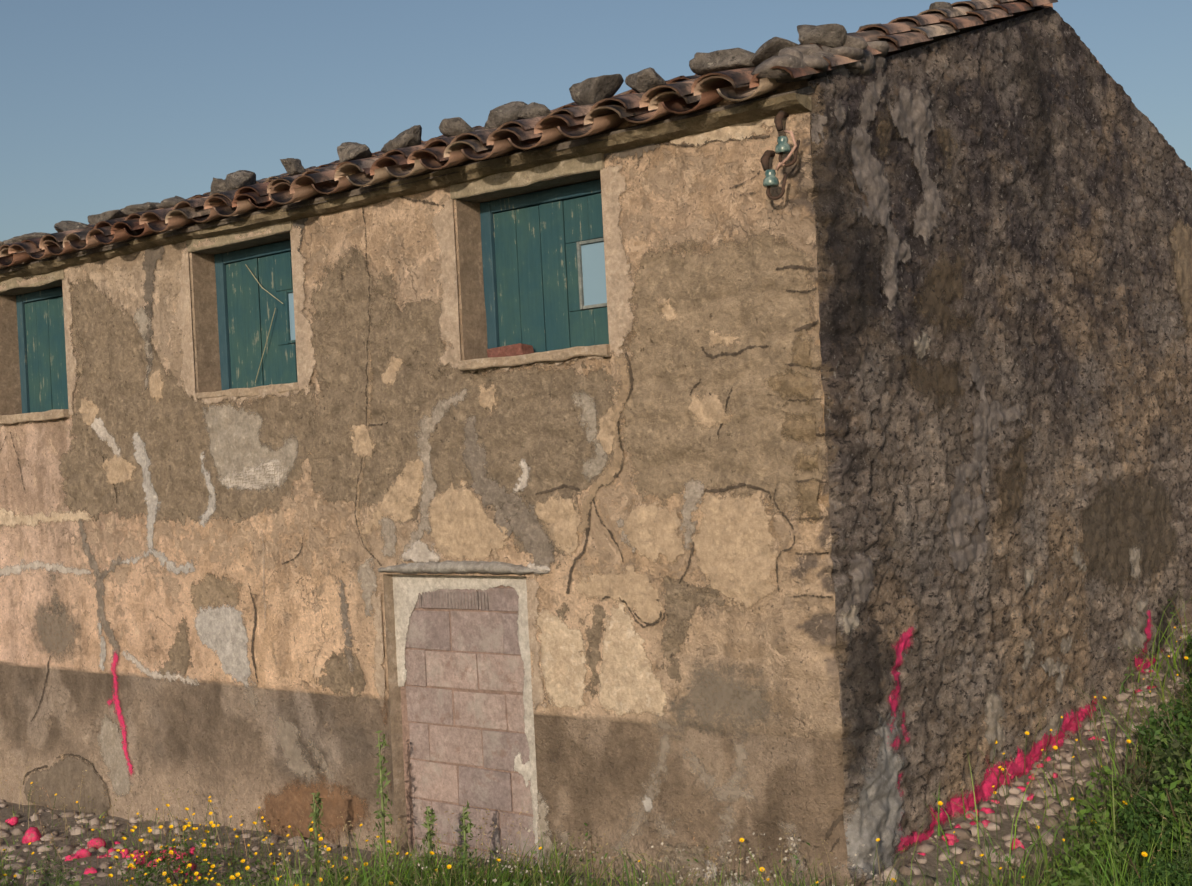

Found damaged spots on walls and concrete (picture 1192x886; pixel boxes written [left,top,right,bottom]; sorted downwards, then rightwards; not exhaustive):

crack [354,206,635,594]
crack [690,345,821,439]
crack [198,451,216,527]
flaking render [0,230,827,716]
crack [0,417,199,686]
crack [603,478,831,628]
damp [1128,547,1142,580]
damp [836,605,860,635]
damp [276,718,335,783]
damp [615,663,779,864]
damp [984,692,1022,776]
damp [1022,635,1073,744]